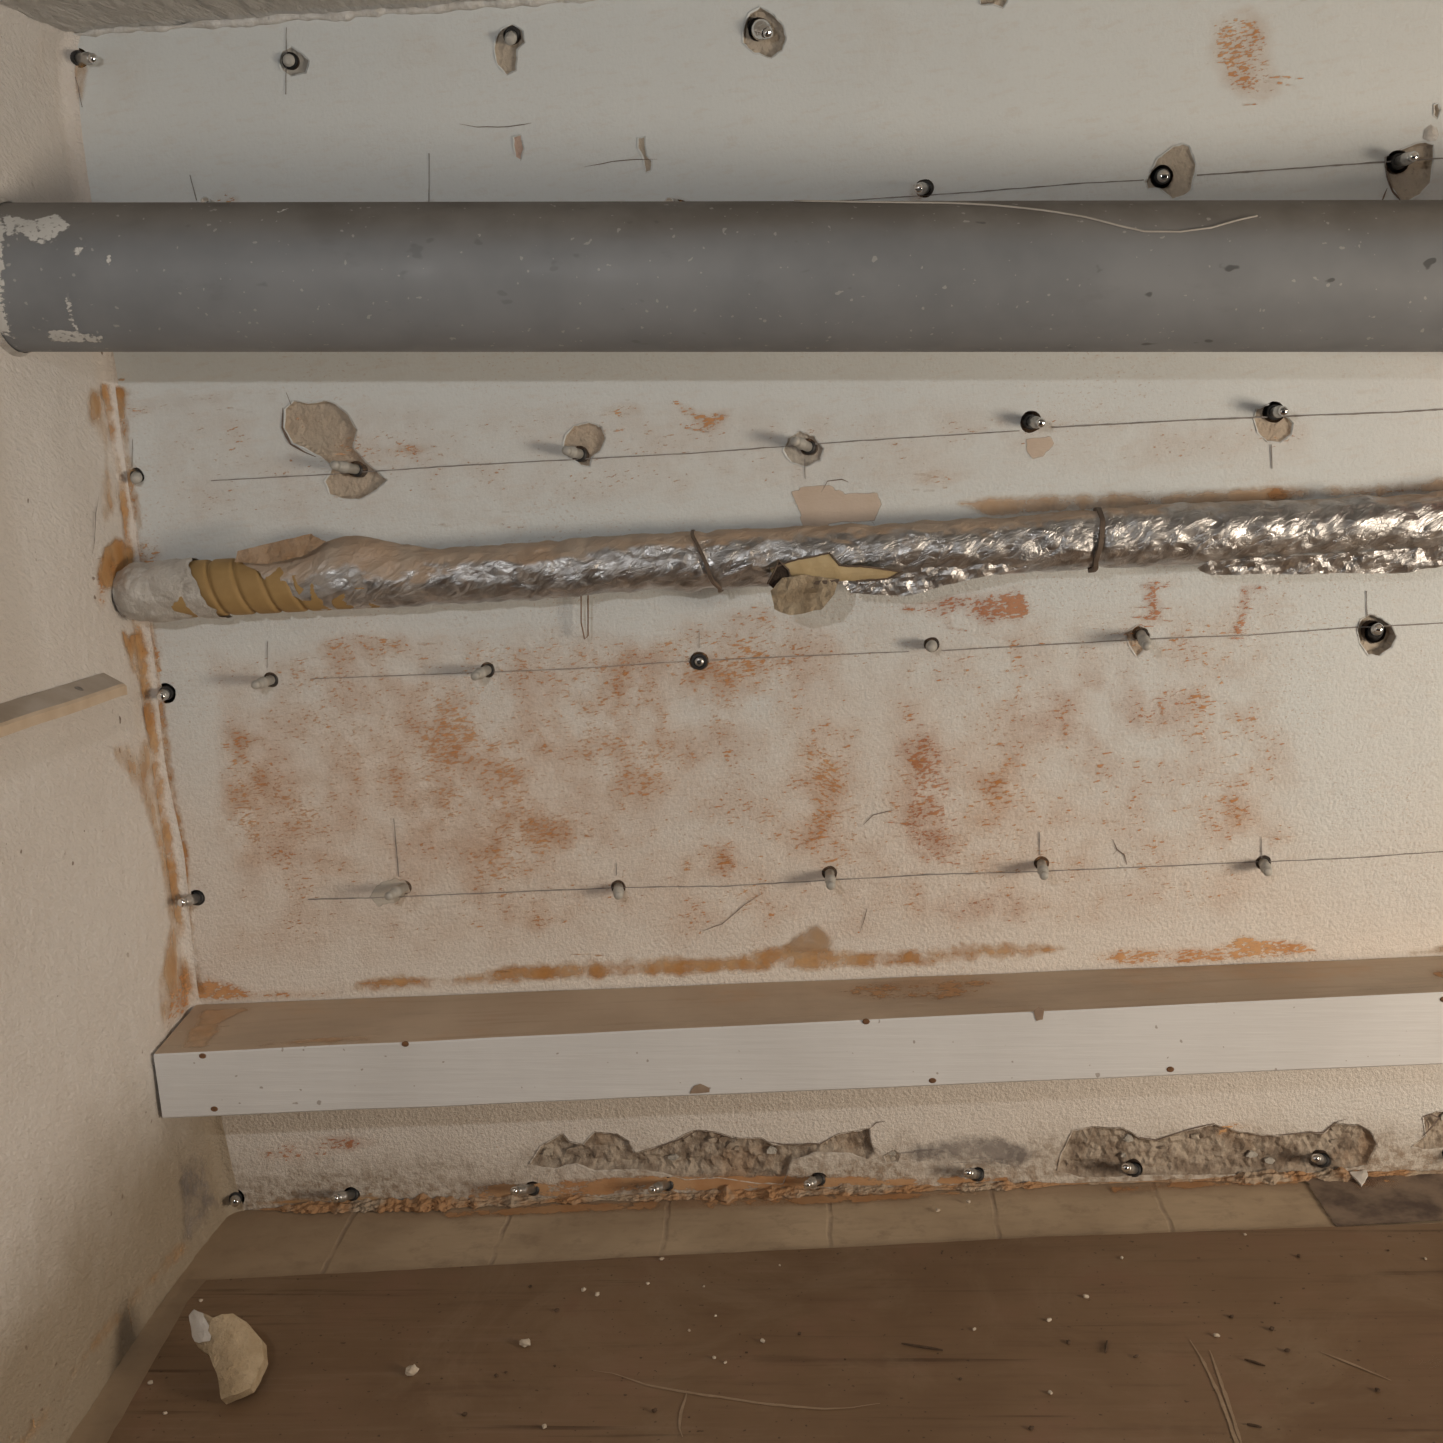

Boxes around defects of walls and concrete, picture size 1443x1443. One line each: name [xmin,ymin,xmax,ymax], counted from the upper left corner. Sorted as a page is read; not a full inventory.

rust [1215,18,1302,105]
rust [102,384,145,435]
spalling [283,400,388,500]
rust [98,470,160,603]
rust [122,627,188,924]
rust [223,607,871,947]
rust [874,581,1285,922]
rust [467,945,1054,981]
rust [1098,937,1316,964]
spalling [529,1128,901,1184]
spalling [1057,1122,1378,1186]
spalling [1411,1111,1443,1150]